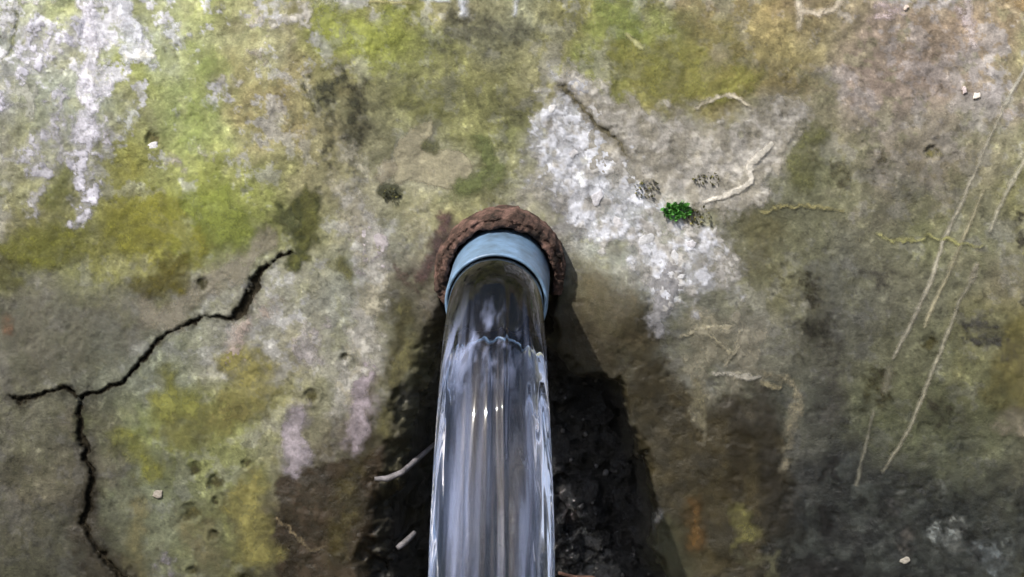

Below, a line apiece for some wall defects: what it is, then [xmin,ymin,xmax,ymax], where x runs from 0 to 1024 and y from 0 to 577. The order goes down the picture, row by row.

damp [301,67,380,173]
crack [9,251,293,577]
damp [274,181,389,577]